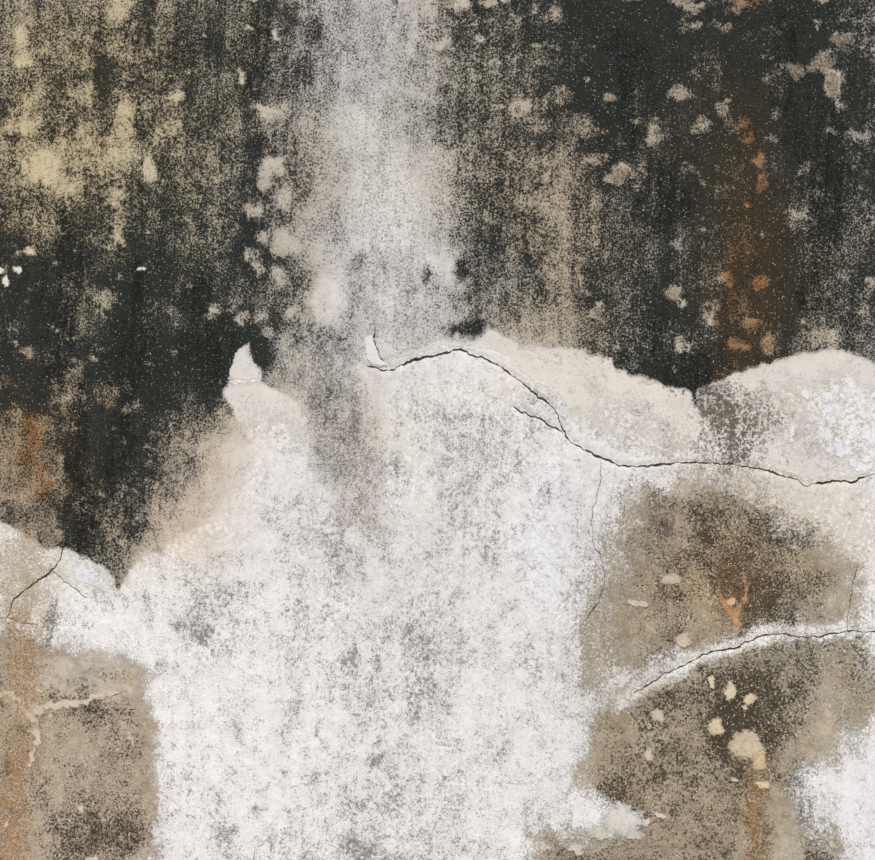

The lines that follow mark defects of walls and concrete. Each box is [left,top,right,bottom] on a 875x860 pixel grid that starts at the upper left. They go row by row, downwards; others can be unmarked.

rust [726,0,761,14]
rust [708,101,774,381]
leakage [0,0,875,678]
crack [366,332,874,615]
crack [3,539,87,624]
rust [718,570,748,626]
crack [635,566,875,692]
leakage [0,688,121,768]
rust [743,749,773,860]